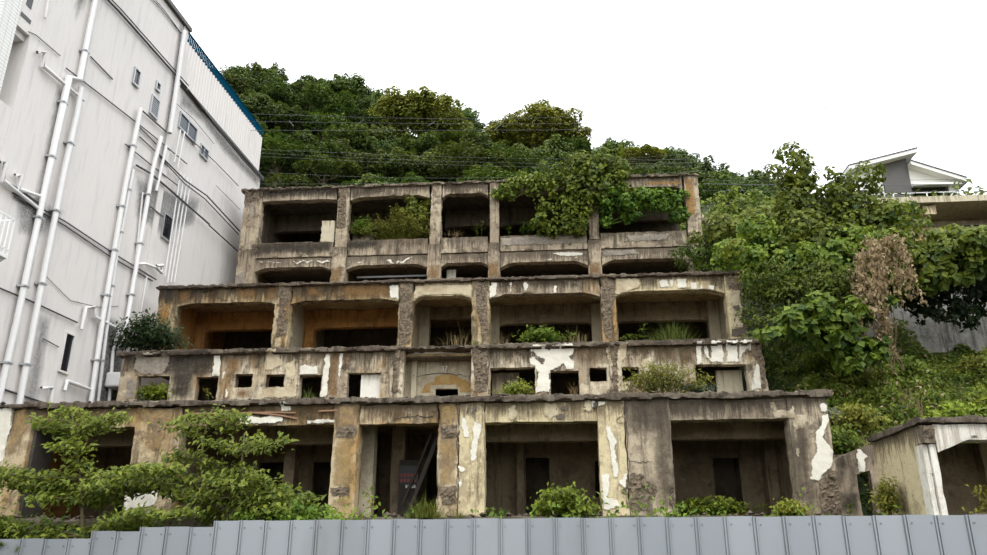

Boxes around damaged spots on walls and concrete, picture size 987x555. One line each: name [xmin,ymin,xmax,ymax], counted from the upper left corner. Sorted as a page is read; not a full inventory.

peeling [238,348,357,439]
spalling [330,487,350,497]
spalling [389,278,497,393]
spalling [439,406,481,505]
peeling [508,404,529,420]
peeling [530,343,574,393]
peeling [544,402,567,420]
peeling [583,400,605,412]
spalling [601,426,676,511]
peeling [696,270,767,390]
spalling [770,402,808,430]
peeling [810,403,842,514]